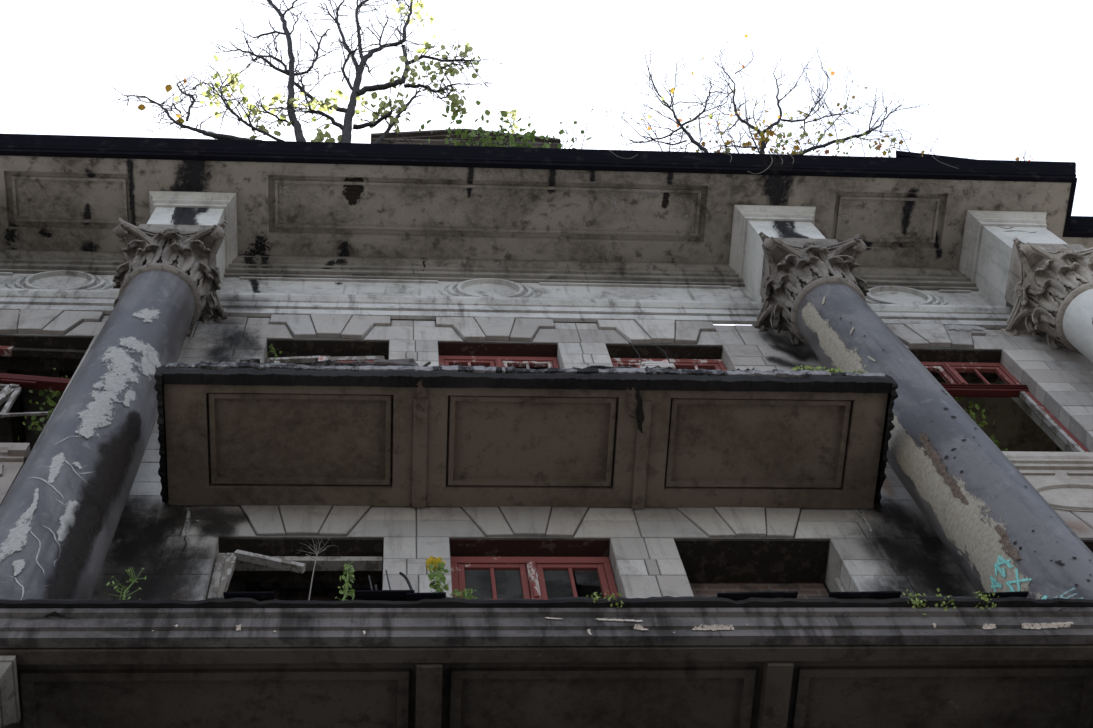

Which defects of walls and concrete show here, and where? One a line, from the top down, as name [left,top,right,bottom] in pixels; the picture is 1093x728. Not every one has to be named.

leakage [170,143,212,192]
leakage [758,152,794,206]
leakage [173,207,208,225]
leakage [774,221,809,238]
leakage [898,188,918,248]
leakage [934,231,943,258]
crack [31,436,91,506]
peeling [0,453,82,576]
peeling [888,415,1042,599]
crack [11,526,79,619]